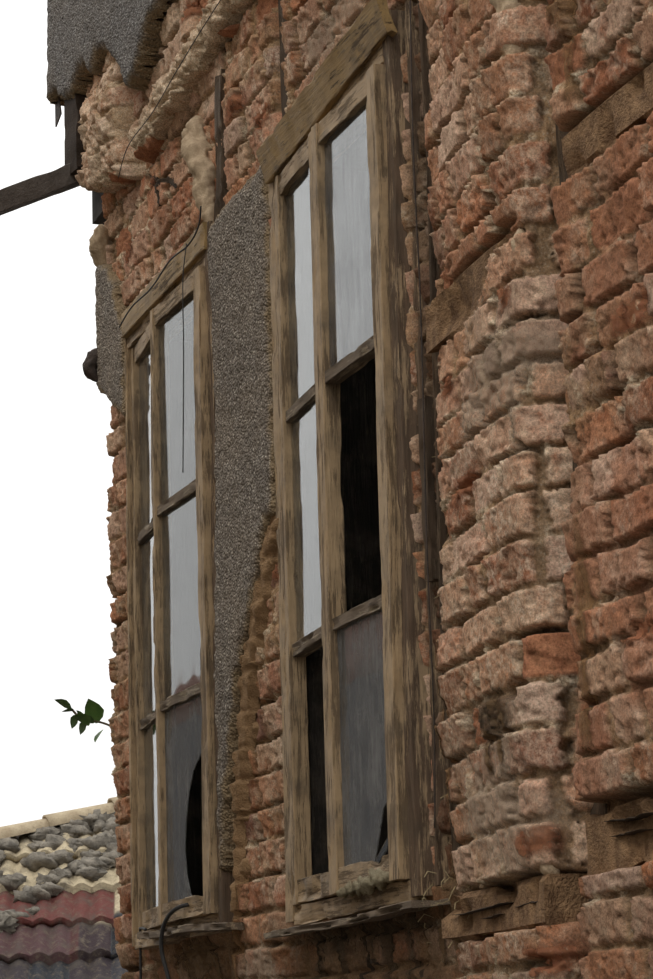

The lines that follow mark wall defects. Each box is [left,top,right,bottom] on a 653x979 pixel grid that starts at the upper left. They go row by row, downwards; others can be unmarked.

spalling [181,0,201,23]
spalling [252,102,269,132]
flaking render [229,515,279,919]
crack [604,812,653,837]